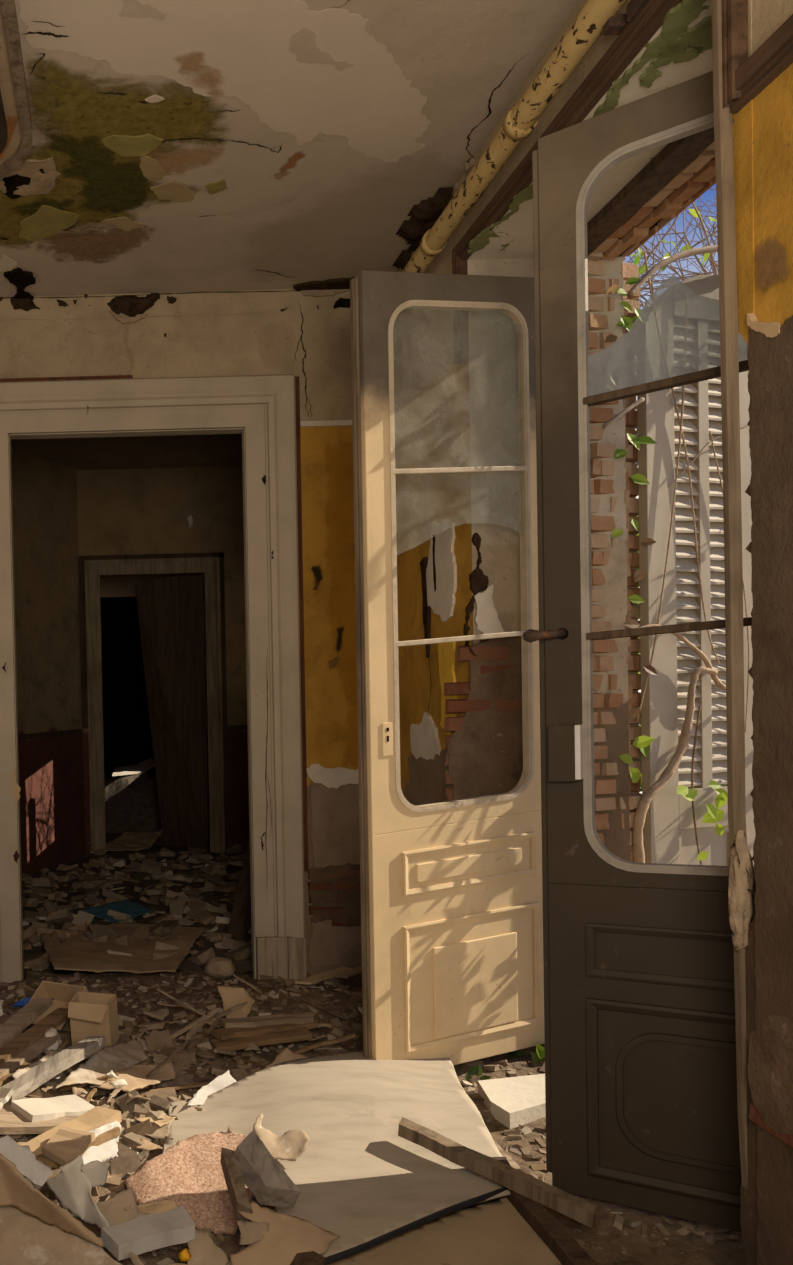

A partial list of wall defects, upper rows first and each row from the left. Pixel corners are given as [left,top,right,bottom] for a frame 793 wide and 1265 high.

peeling [0,156,79,243]
water stain [0,53,224,263]
peeling [102,133,227,202]
peeling [17,0,431,163]
spalling [392,157,475,271]
crack [466,53,529,163]
spalling [0,254,40,311]
spalling [107,293,177,324]
crack [0,268,312,420]
peeling [307,763,362,968]